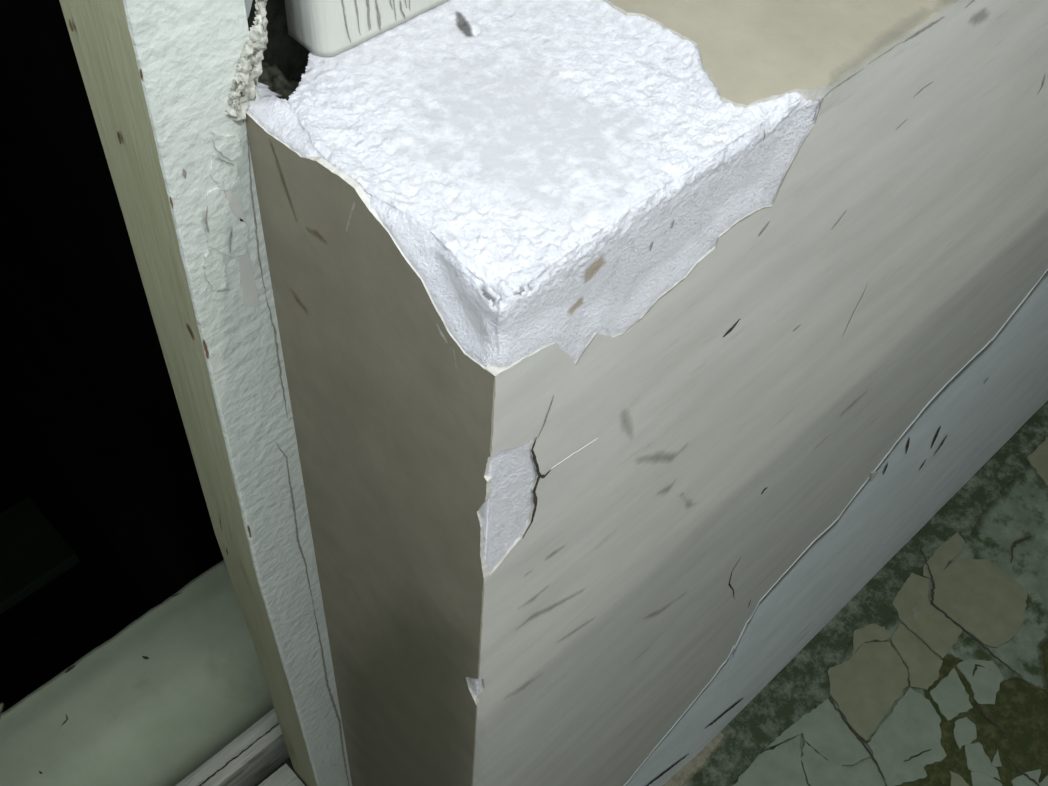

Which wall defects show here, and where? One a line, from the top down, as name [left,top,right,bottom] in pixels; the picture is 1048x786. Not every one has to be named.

crack [246,126,288,419]
flaking render [247,0,831,367]
crack [277,444,349,786]
flaking render [479,439,537,573]
crack [523,396,554,538]
peeling [623,269,1048,786]
crack [732,532,1048,786]
crack [1026,437,1048,487]